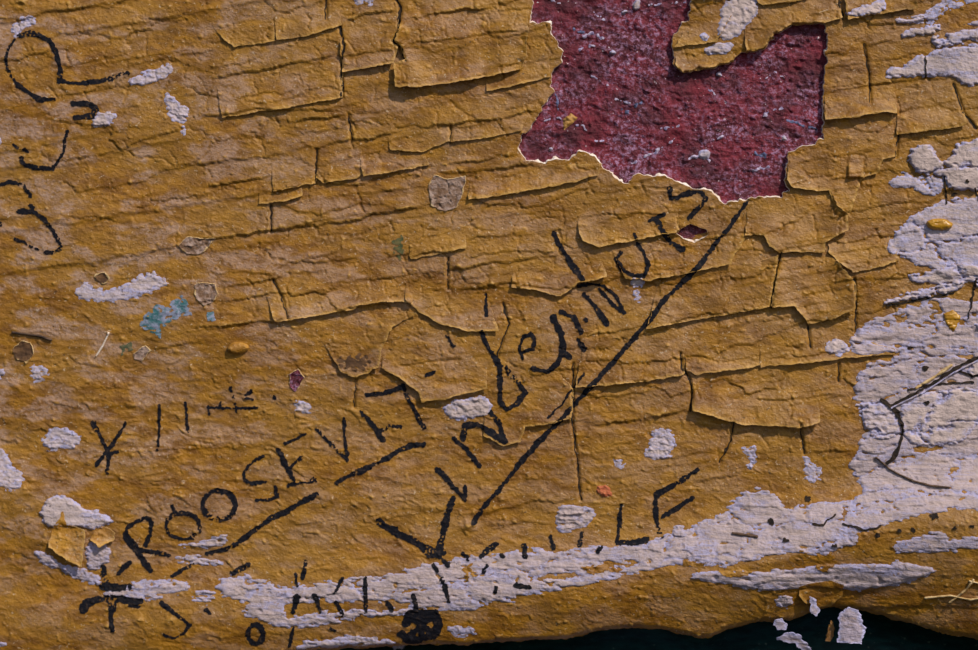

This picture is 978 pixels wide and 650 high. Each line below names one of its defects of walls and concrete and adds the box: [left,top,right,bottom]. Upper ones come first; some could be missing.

crack [391,0,407,61]
crack [325,0,353,140]
peeling [75,271,169,303]
crack [497,303,510,359]
peeling [192,0,978,629]
crack [771,252,782,308]
crack [680,352,694,412]
crack [571,364,582,500]
peeling [34,495,115,585]
peeling [103,579,190,601]
peeling [773,618,811,650]
peeling [825,607,866,644]